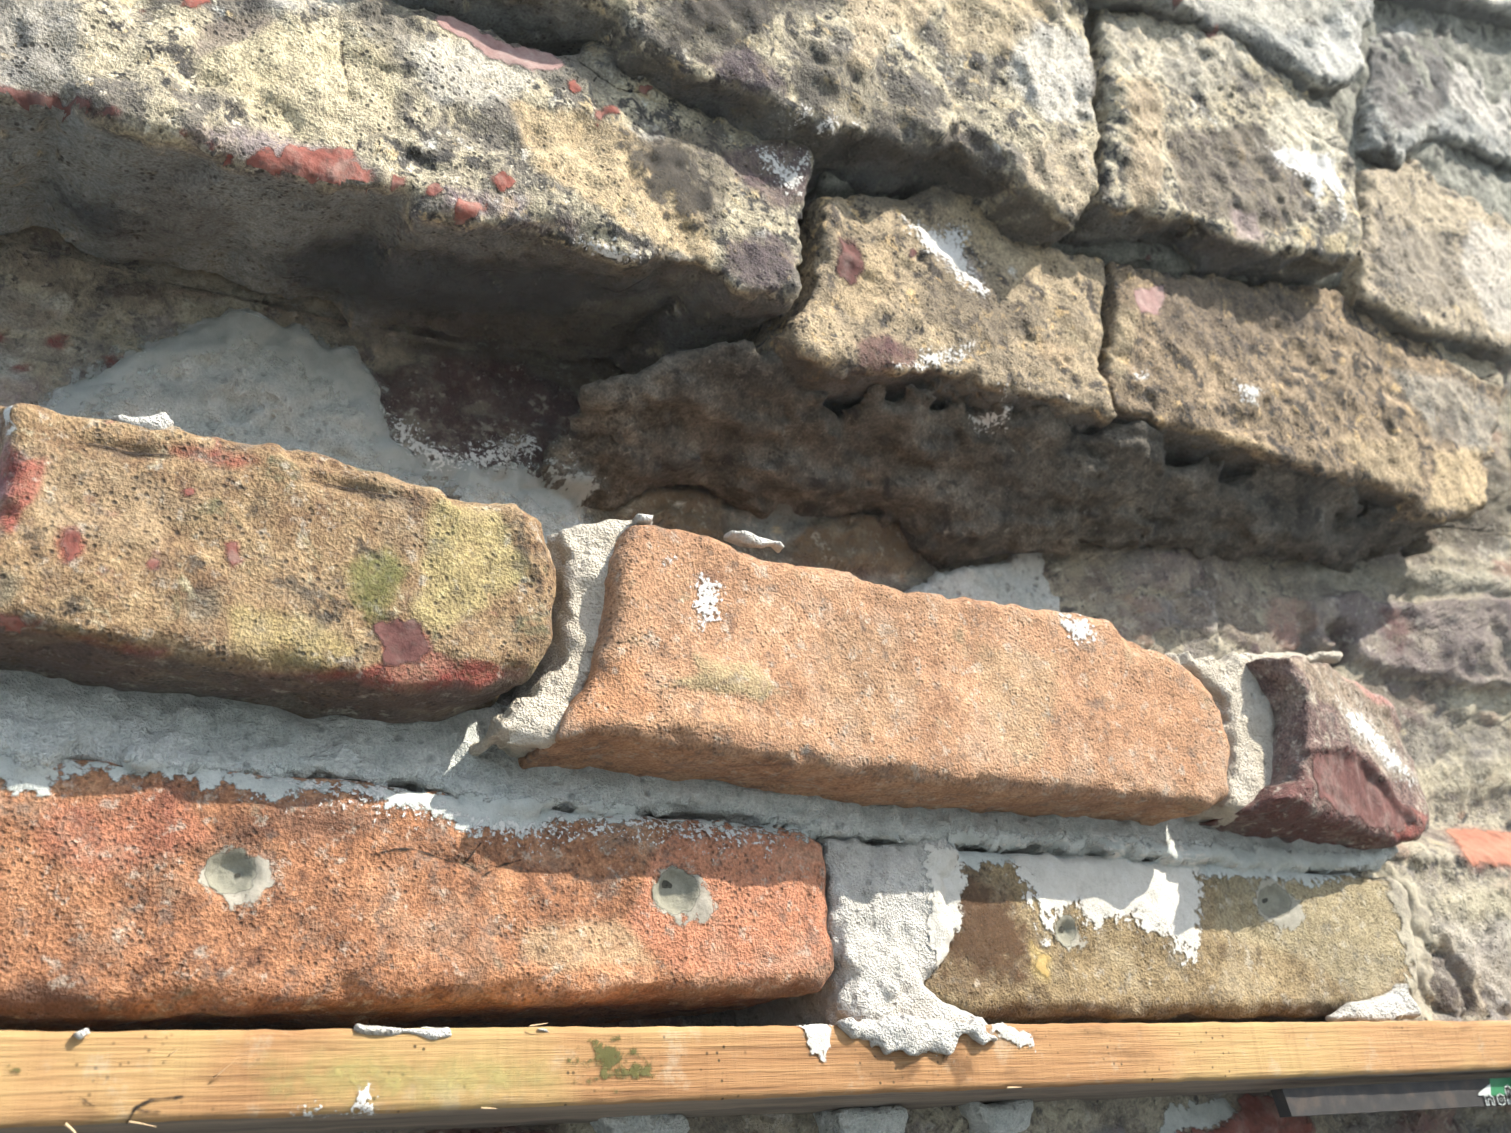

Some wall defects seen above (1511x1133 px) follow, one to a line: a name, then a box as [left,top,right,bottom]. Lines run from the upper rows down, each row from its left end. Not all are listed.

spalling [1445,828,1511,867]